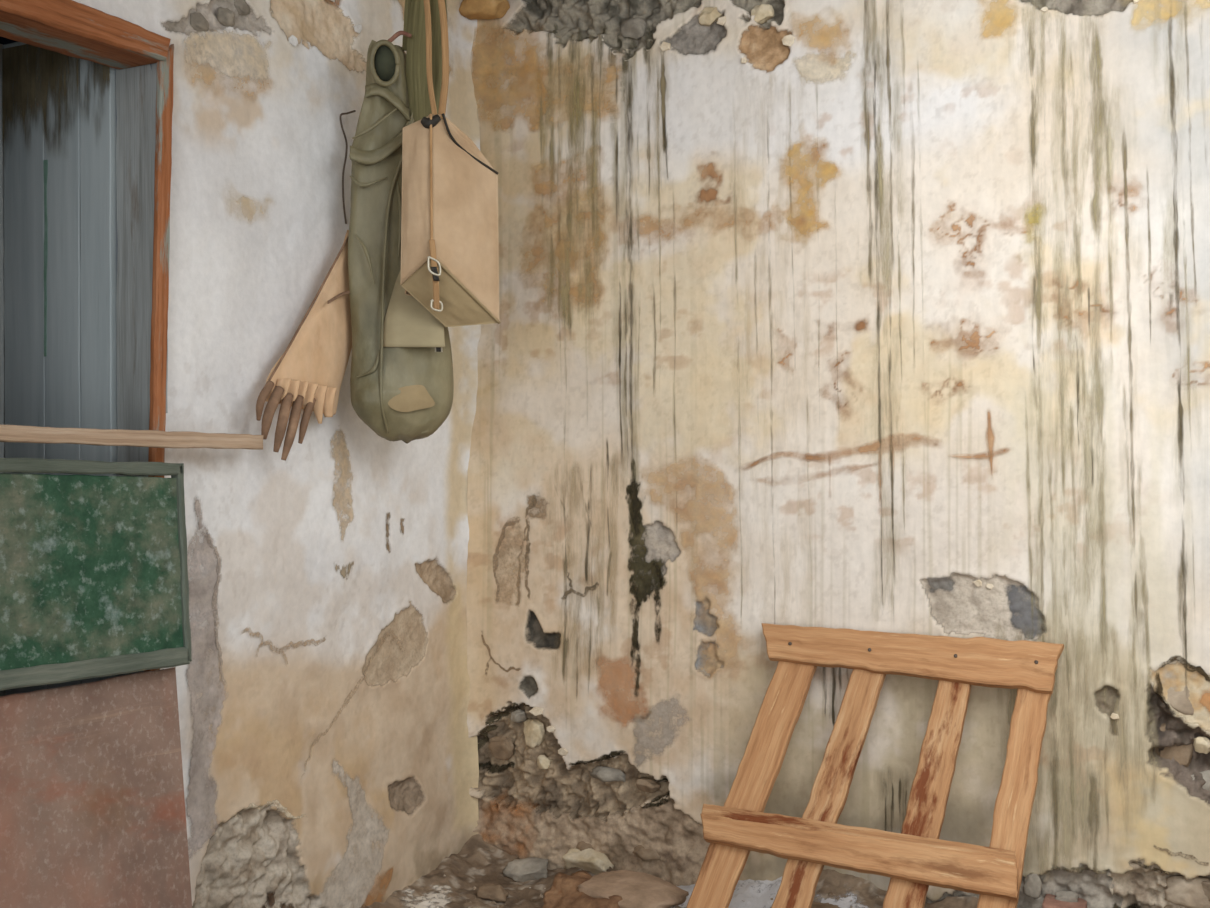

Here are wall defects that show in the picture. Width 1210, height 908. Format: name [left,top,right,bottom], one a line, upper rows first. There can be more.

water stain [507,0,723,73]
water stain [732,0,785,30]
spalling [1021,0,1140,16]
water stain [648,62,668,219]
water stain [865,12,914,281]
water stain [1178,348,1190,458]
water stain [585,288,665,696]
spalling [920,572,1047,641]
spalling [186,500,428,908]
spalling [473,676,710,886]
spalling [1146,662,1210,804]
spalling [1017,859,1210,908]